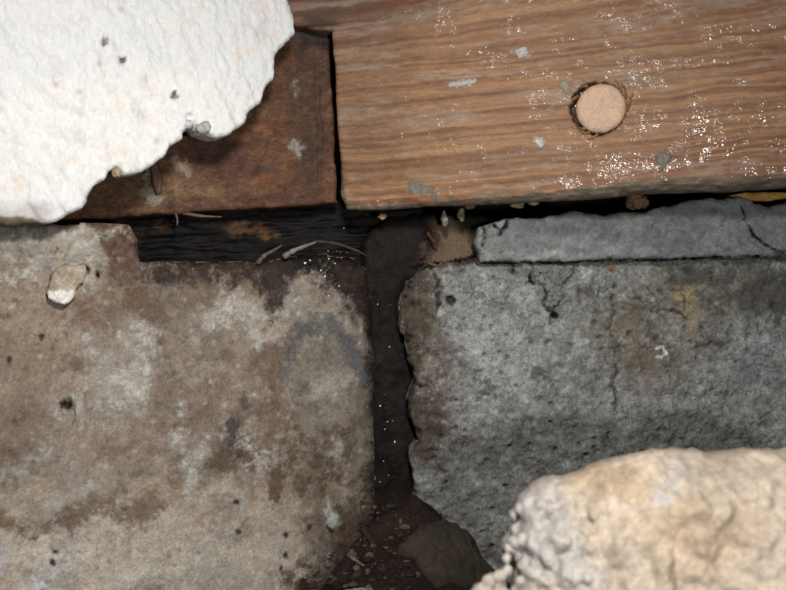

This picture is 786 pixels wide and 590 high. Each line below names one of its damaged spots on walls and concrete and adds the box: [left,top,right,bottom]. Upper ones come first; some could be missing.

leakage [51,320,162,423]
leakage [148,215,442,590]
crack [404,208,786,443]
leakage [0,510,24,533]
leakage [29,472,165,540]